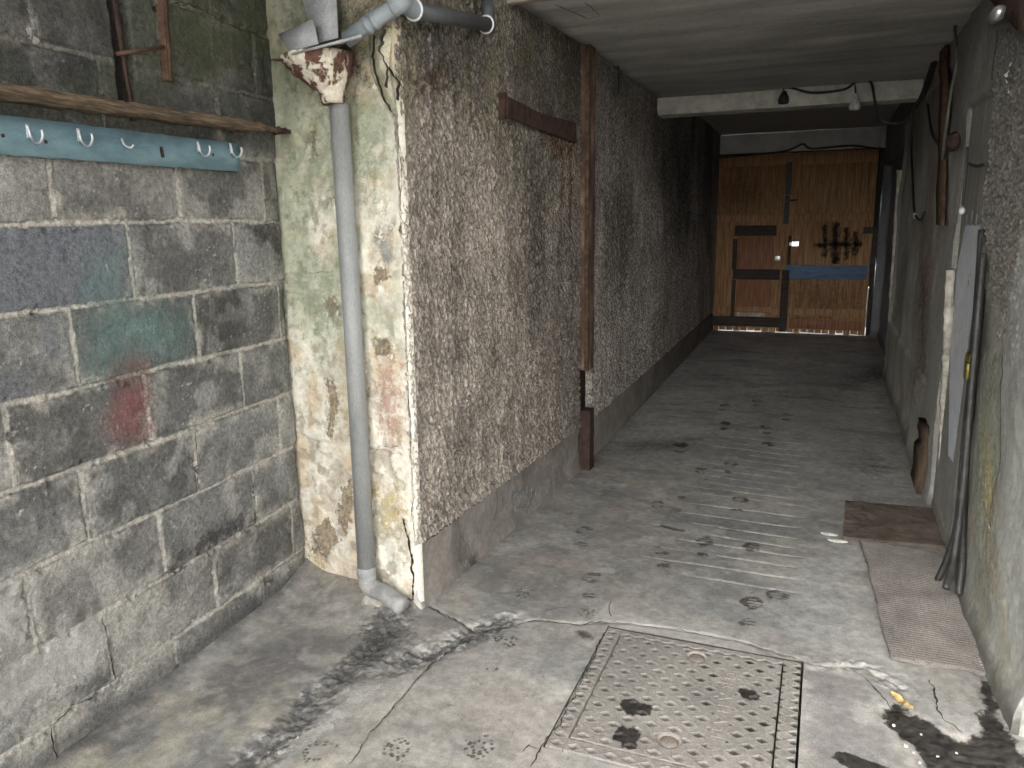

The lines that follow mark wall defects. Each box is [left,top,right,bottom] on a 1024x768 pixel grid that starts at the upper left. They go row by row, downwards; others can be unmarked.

spalling [321,376,340,440]
spalling [311,479,354,557]
crack [351,488,814,765]
damp [831,751,888,768]
crack [929,680,963,733]
damp [882,680,1024,768]